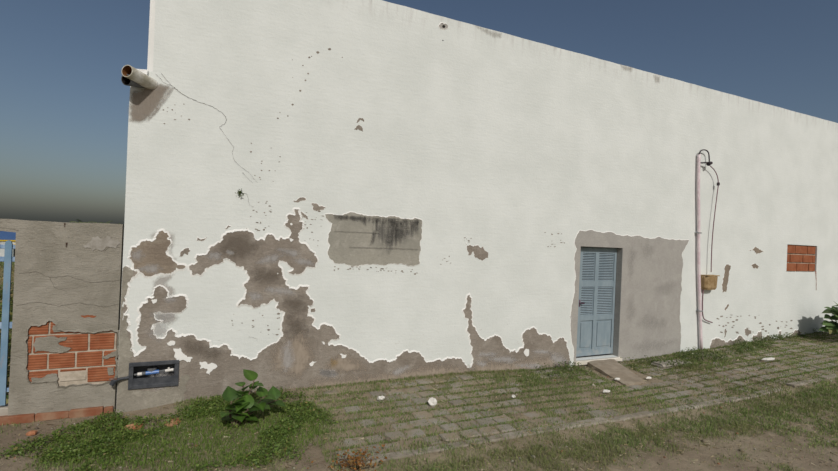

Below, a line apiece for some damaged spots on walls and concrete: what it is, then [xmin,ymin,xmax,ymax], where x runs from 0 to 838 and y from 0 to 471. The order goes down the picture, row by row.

leakage [130,85,168,121]
peeling [23,197,570,400]
peeling [721,264,731,293]
peeling [710,304,801,348]